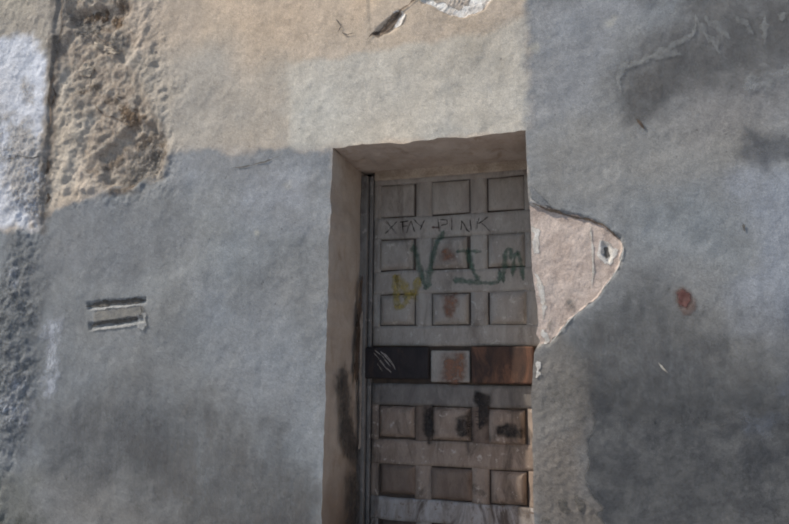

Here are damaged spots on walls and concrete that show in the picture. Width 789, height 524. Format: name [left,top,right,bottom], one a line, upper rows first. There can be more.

flaking render [62,0,167,193]
flaking render [366,0,491,40]
damp [0,369,29,425]
damp [45,323,60,396]
damp [336,367,360,524]
peeling [529,185,624,345]
corrosion [676,288,694,314]
damp [585,321,789,524]